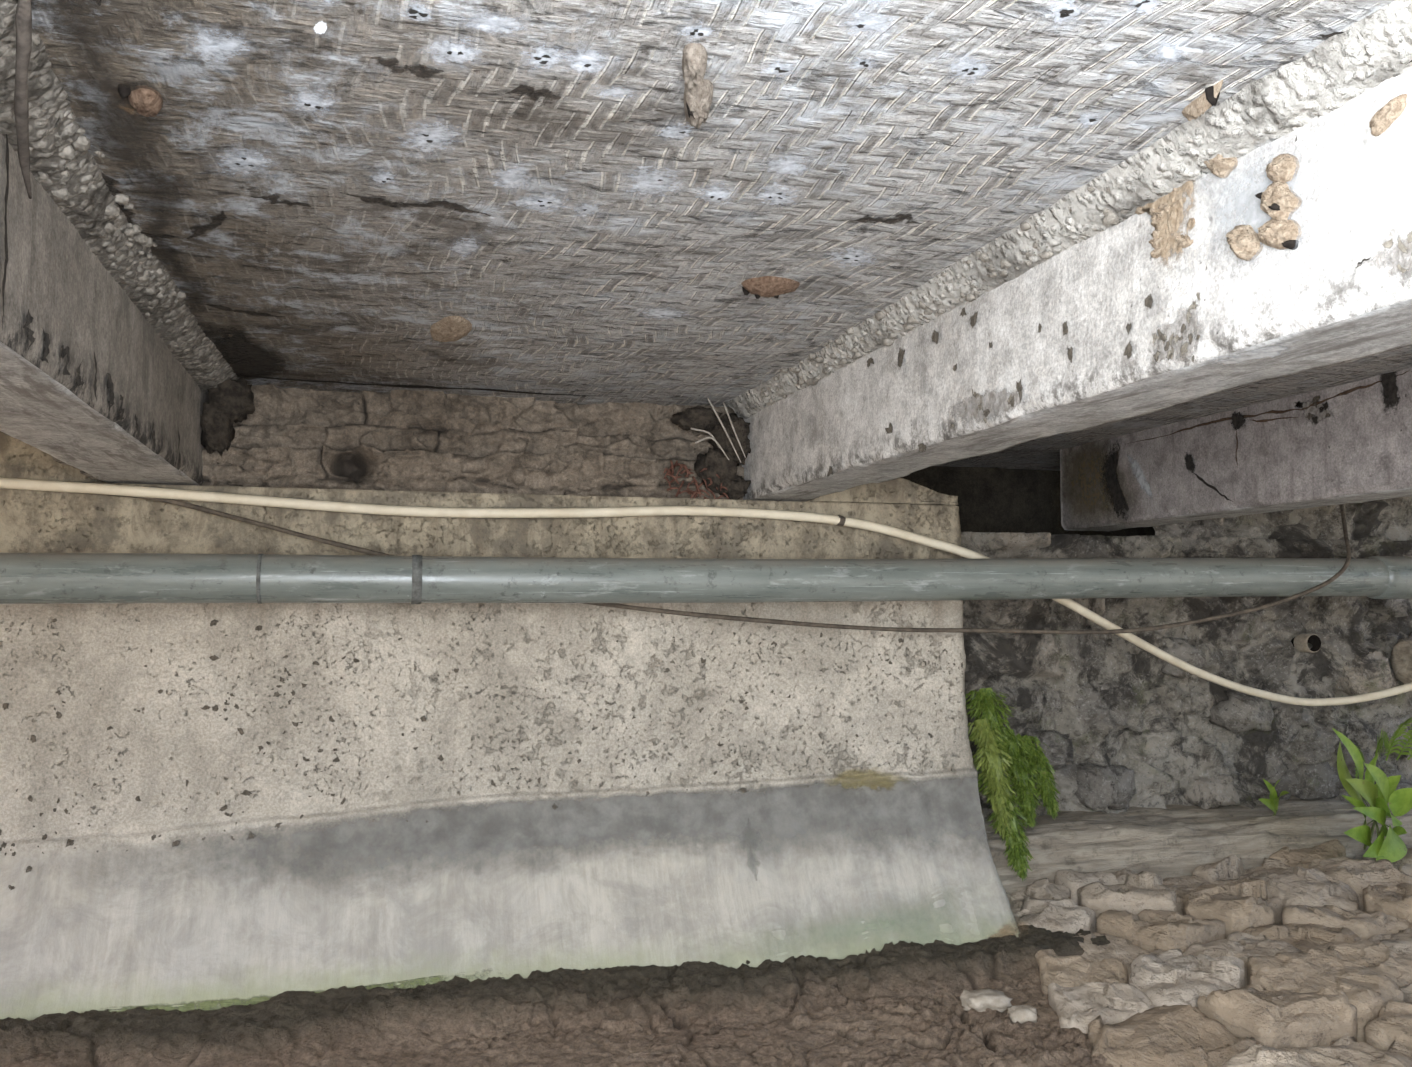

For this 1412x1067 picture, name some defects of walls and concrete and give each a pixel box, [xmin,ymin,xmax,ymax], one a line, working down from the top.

crack [92,157,311,239]
crack [346,194,490,216]
crack [847,214,929,224]
rust [1135,181,1195,264]
water stain [23,309,155,446]
water stain [213,776,988,874]